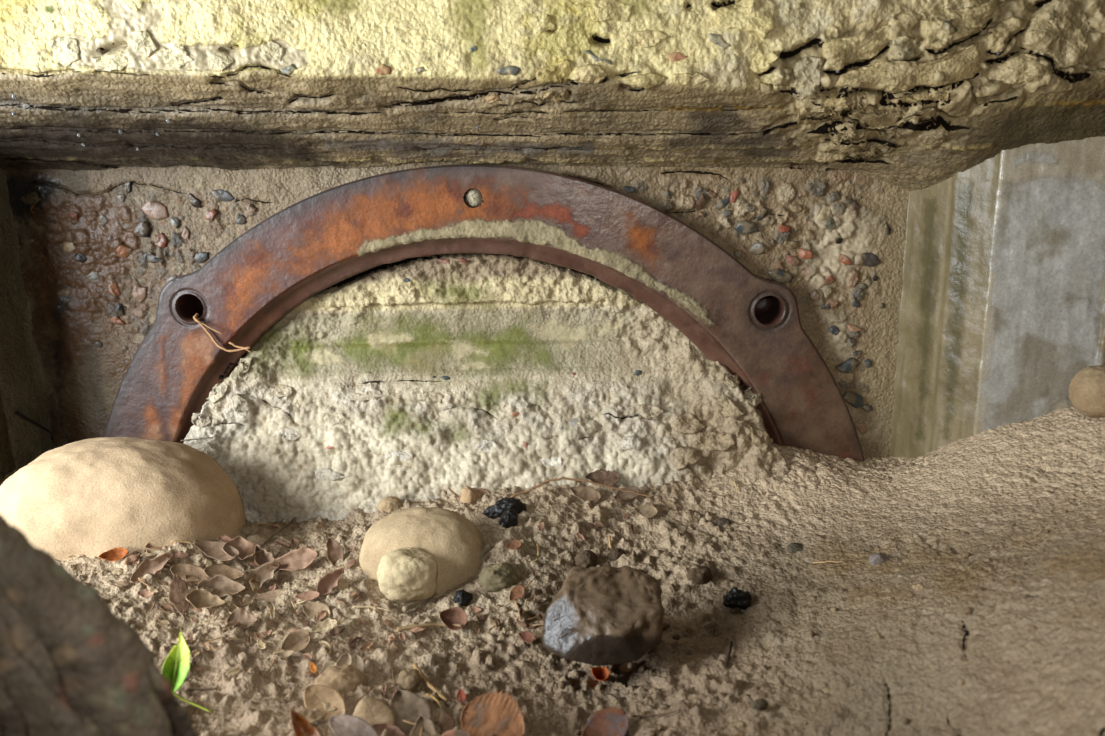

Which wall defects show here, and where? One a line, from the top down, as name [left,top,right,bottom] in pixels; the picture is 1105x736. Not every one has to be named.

crack [2,43,149,78]
peeling [50,0,309,75]
flaking render [497,66,520,76]
crack [592,35,611,43]
peeling [622,52,710,91]
peeling [707,0,776,50]
spalling [750,0,1105,172]
crack [0,65,782,196]
rust [289,182,590,274]
rust [145,247,270,442]
damp [290,341,324,370]
damp [222,383,674,522]